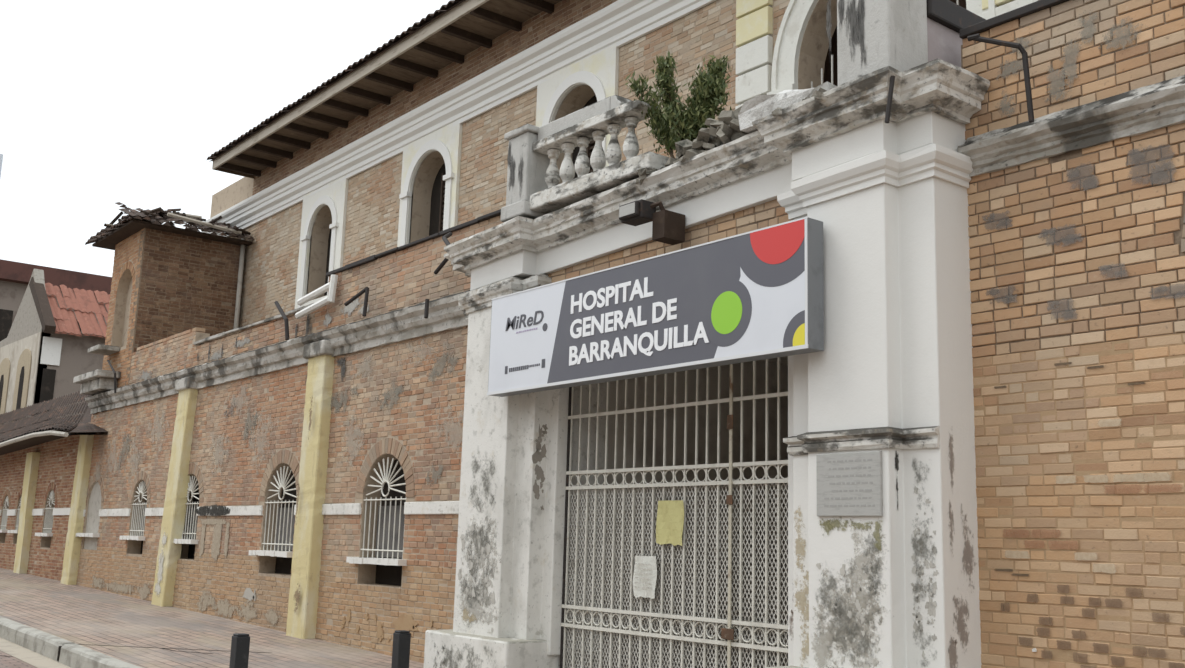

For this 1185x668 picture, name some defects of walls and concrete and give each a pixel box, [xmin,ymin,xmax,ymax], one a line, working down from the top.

damp [826,0,866,67]
spalling [708,111,745,146]
damp [471,460,496,510]
damp [463,524,491,623]
damp [794,508,873,659]
mould [912,531,934,601]